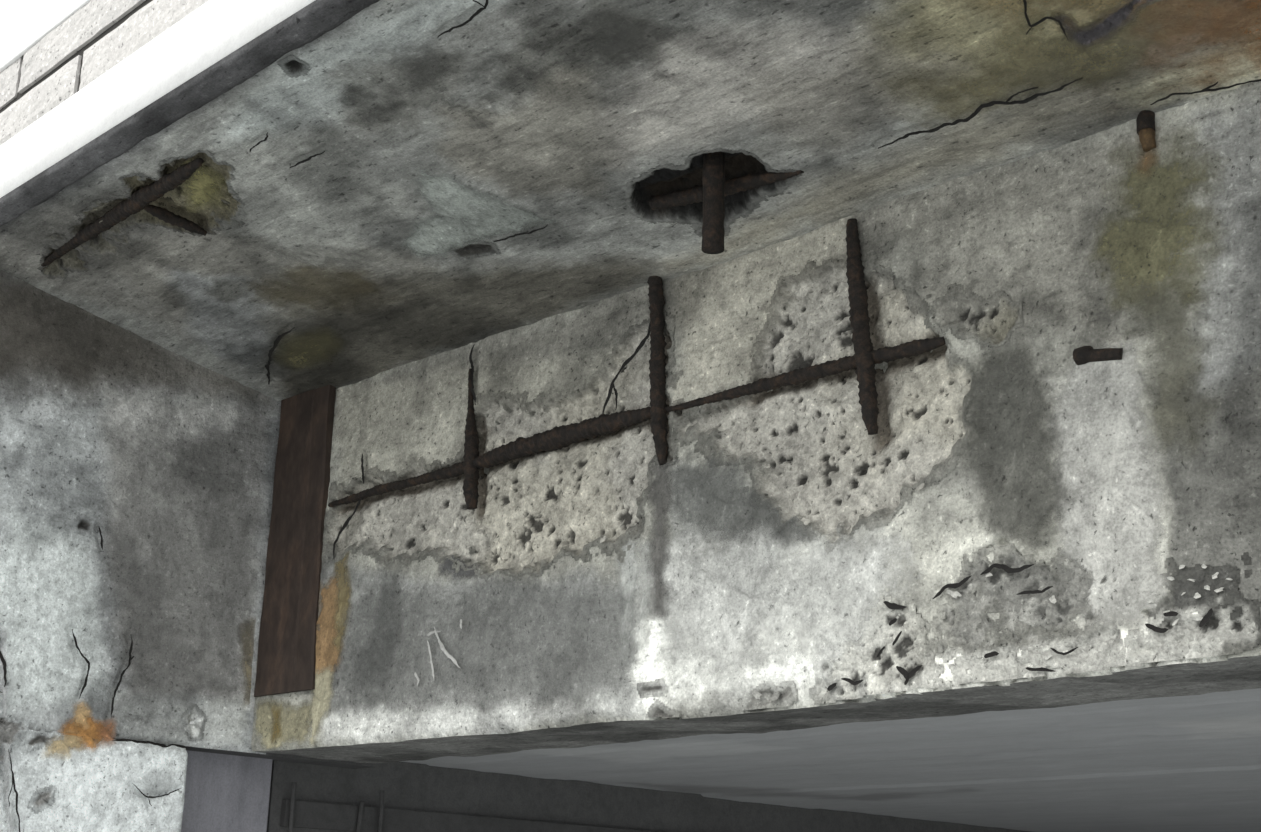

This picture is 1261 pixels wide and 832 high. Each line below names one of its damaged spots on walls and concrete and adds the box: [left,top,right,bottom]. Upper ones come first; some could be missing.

crack [878,77,1083,149]
crack [1150,79,1261,105]
spalling [37,150,247,280]
spalling [624,148,804,237]
corrosion [259,266,372,304]
spalling [323,218,1023,582]
leakage [970,296,1197,626]
crack [0,651,8,693]
corrosion [48,704,114,754]
crack [72,630,190,748]
corrosion [241,555,350,749]
peeling [742,543,1261,710]